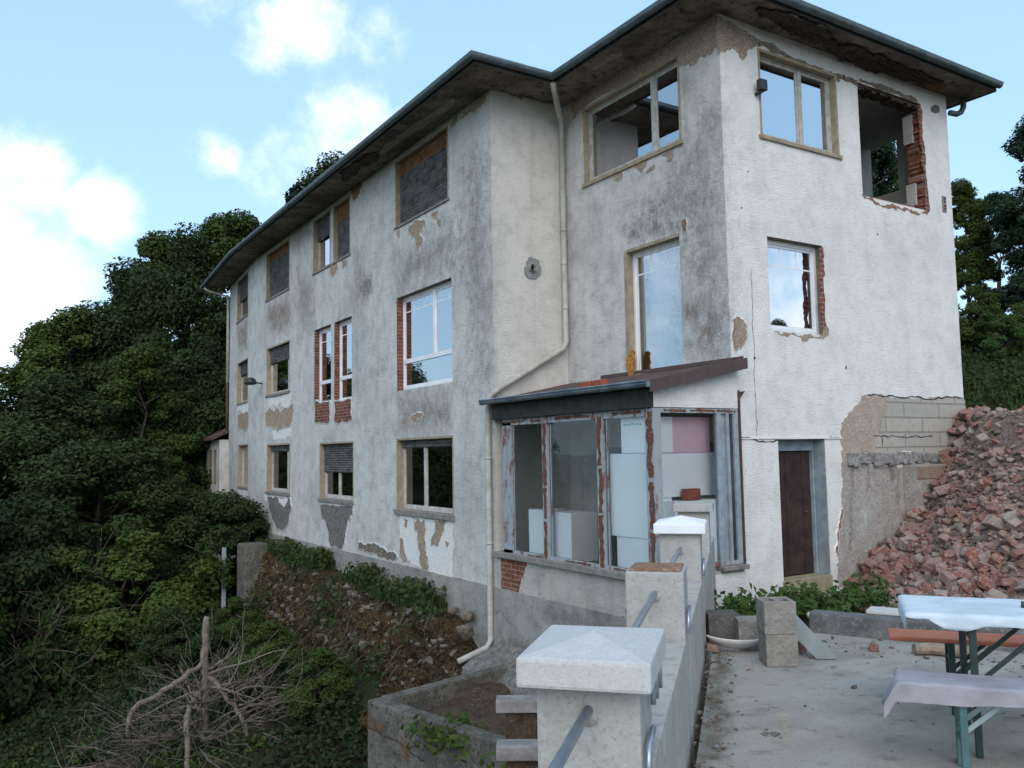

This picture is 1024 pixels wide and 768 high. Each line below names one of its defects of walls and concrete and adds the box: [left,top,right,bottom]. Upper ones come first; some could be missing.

flaking render [571,15,940,215]
flaking render [397,211,441,251]
spalling [731,315,748,352]
crack [742,270,780,443]
flaking render [265,401,294,440]
spalling [264,494,292,532]
spalling [320,503,449,572]
corrosion [504,409,736,572]
spalling [834,394,1024,608]
flaking render [500,558,529,593]